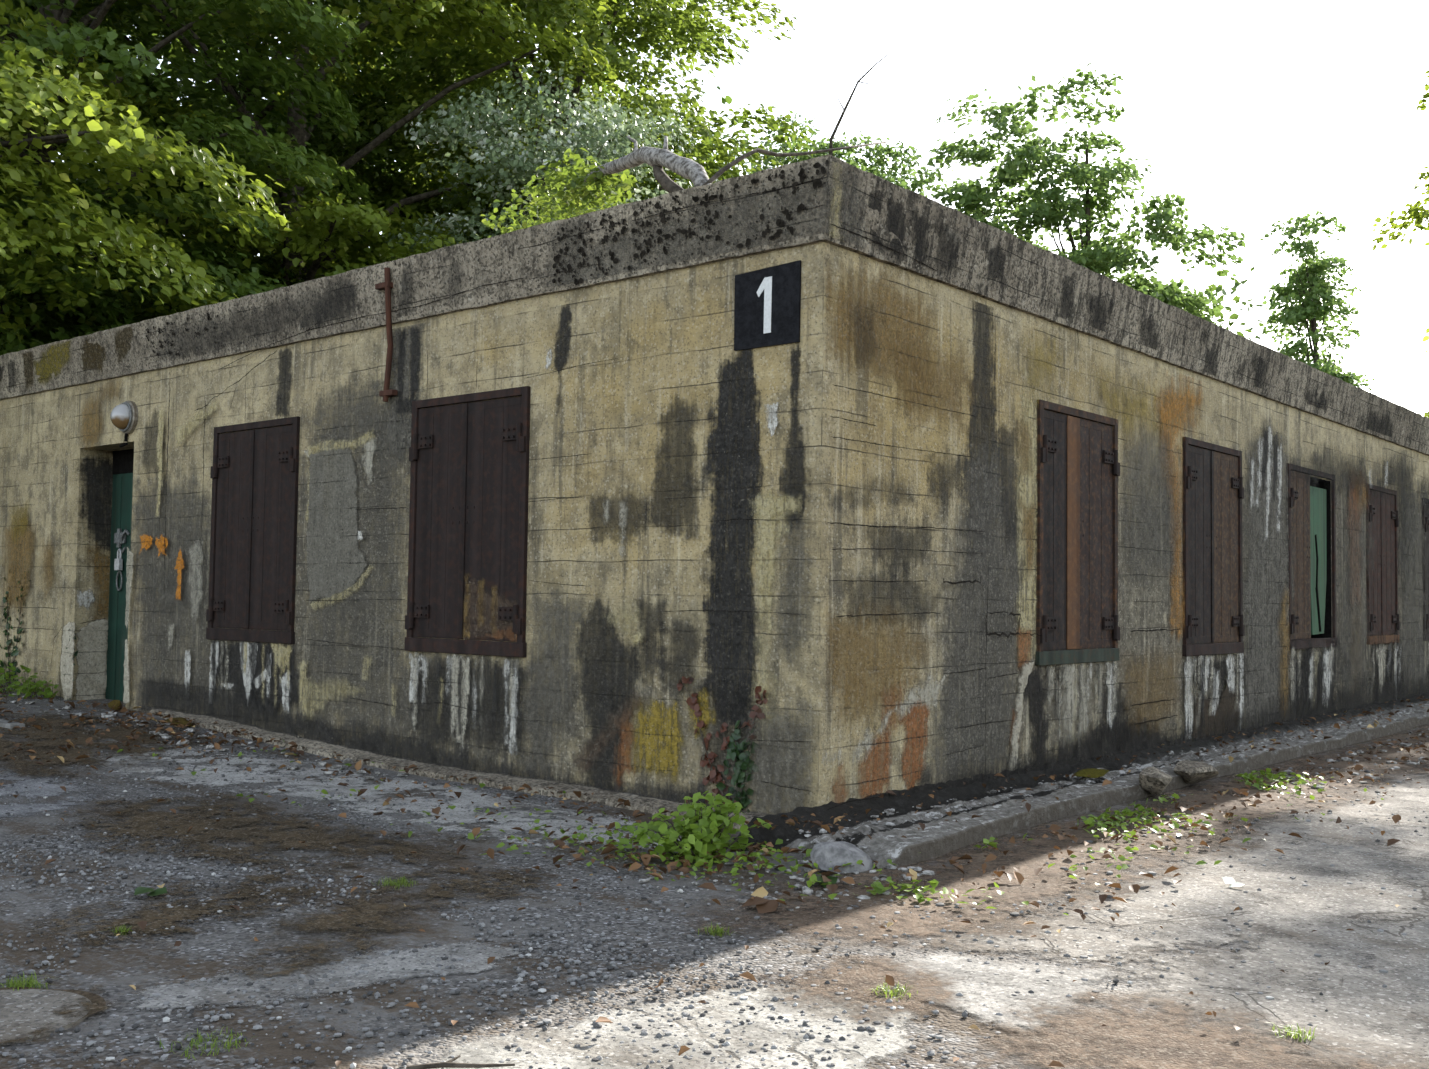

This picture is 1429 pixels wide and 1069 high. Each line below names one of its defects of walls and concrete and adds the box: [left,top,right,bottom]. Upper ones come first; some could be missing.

damp [546,305,571,373]
damp [830,162,959,272]
damp [987,240,1006,284]
damp [1058,271,1113,332]
damp [134,323,811,815]
damp [834,302,1429,794]
corrosion [833,700,930,803]